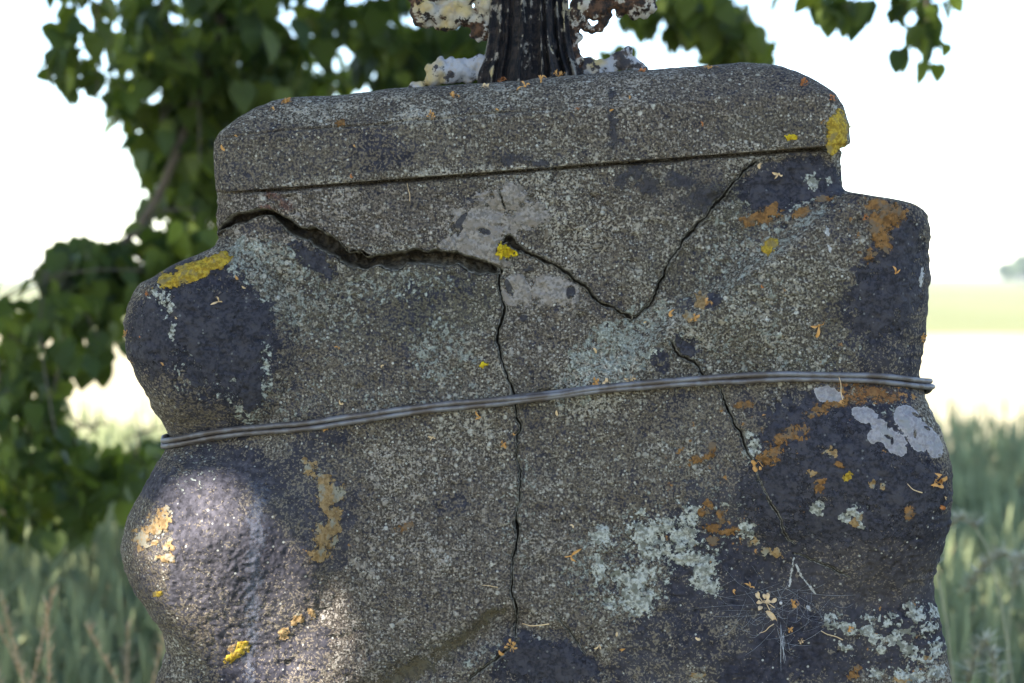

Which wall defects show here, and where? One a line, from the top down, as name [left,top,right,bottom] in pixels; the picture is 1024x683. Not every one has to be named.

crack [218,160,758,682]
crack [669,340,851,578]